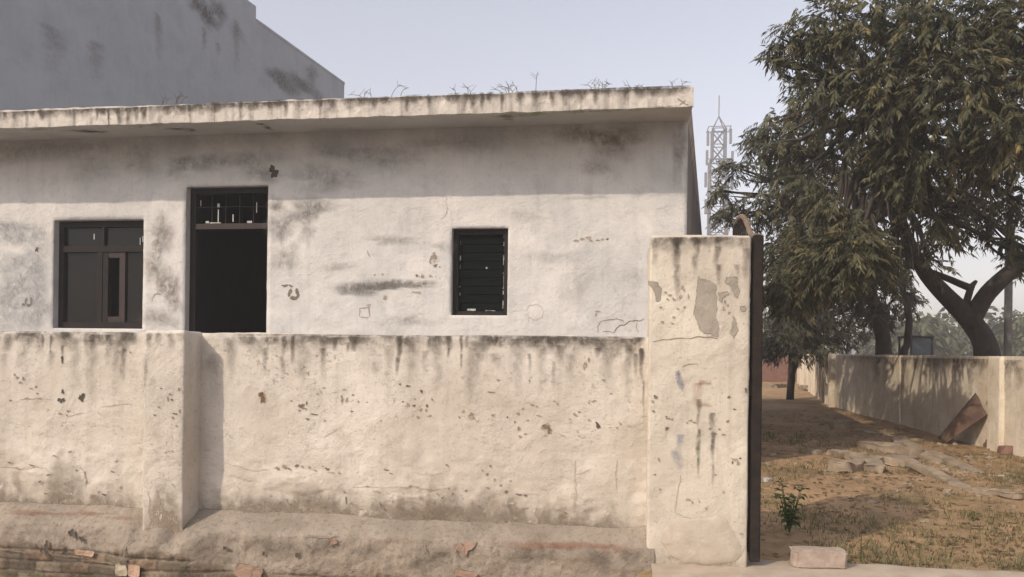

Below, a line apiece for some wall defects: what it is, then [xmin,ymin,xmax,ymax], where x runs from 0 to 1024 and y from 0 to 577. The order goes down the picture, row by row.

water stain [518,86,686,101]
flaking render [648,276,746,338]
water stain [275,334,360,349]
water stain [480,335,644,363]
crack [597,318,717,342]